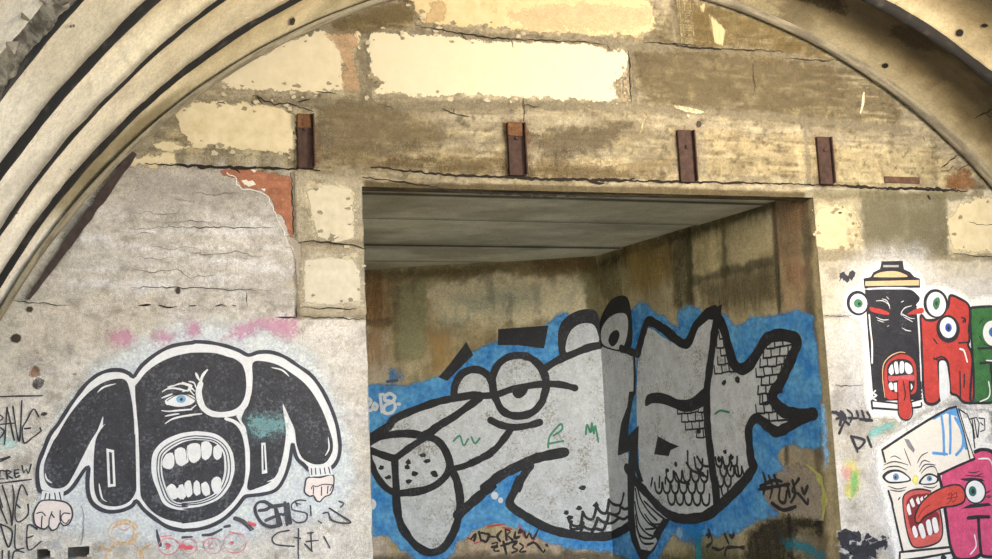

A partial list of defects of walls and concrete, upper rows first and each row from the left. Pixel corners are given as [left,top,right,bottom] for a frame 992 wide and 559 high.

spalling [0,0,76,102]
rust [297,114,311,128]
peeling [130,0,656,169]
crack [363,155,969,200]
peeling [220,169,366,312]